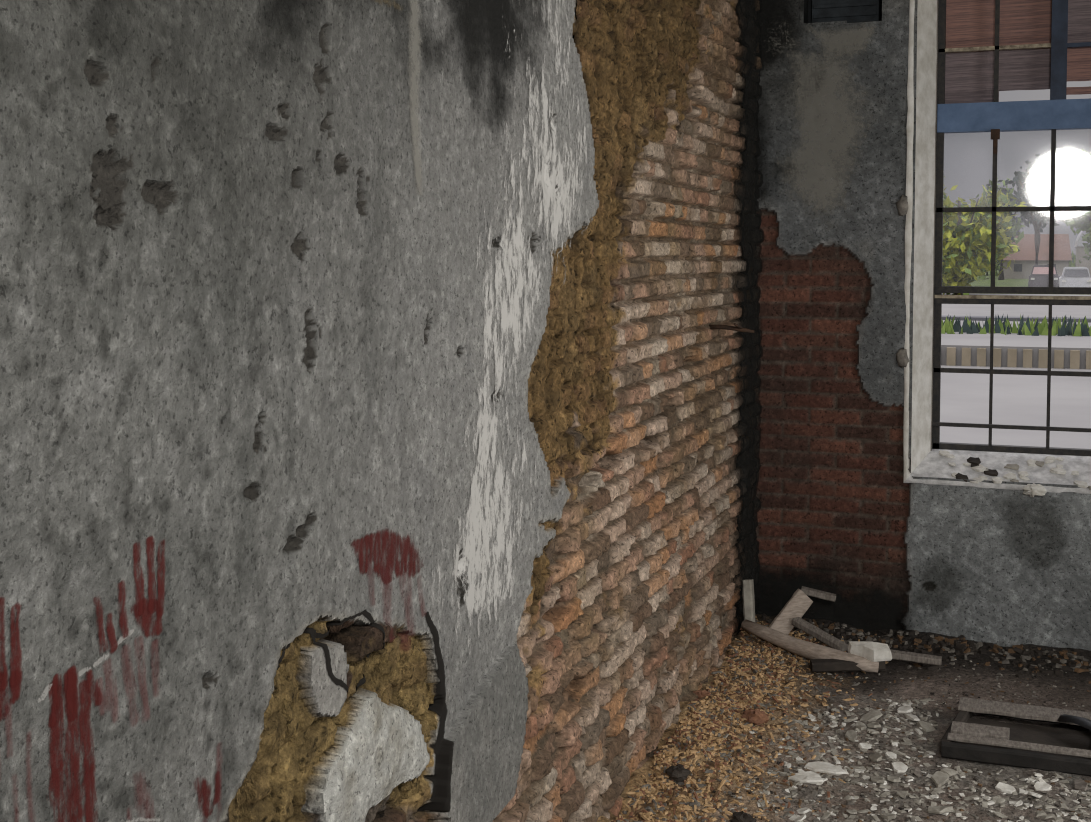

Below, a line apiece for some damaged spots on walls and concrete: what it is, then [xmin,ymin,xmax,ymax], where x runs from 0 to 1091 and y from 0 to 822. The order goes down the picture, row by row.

spalling [265,101,291,140]
spalling [313,22,371,215]
damp [410,0,422,194]
spalling [90,113,135,229]
spalling [141,178,182,213]
spalling [291,231,311,261]
spalling [302,306,323,372]
spalling [253,411,268,452]
spalling [432,0,938,822]
spalling [243,480,262,500]
spalling [283,511,318,552]
spalling [221,615,451,822]